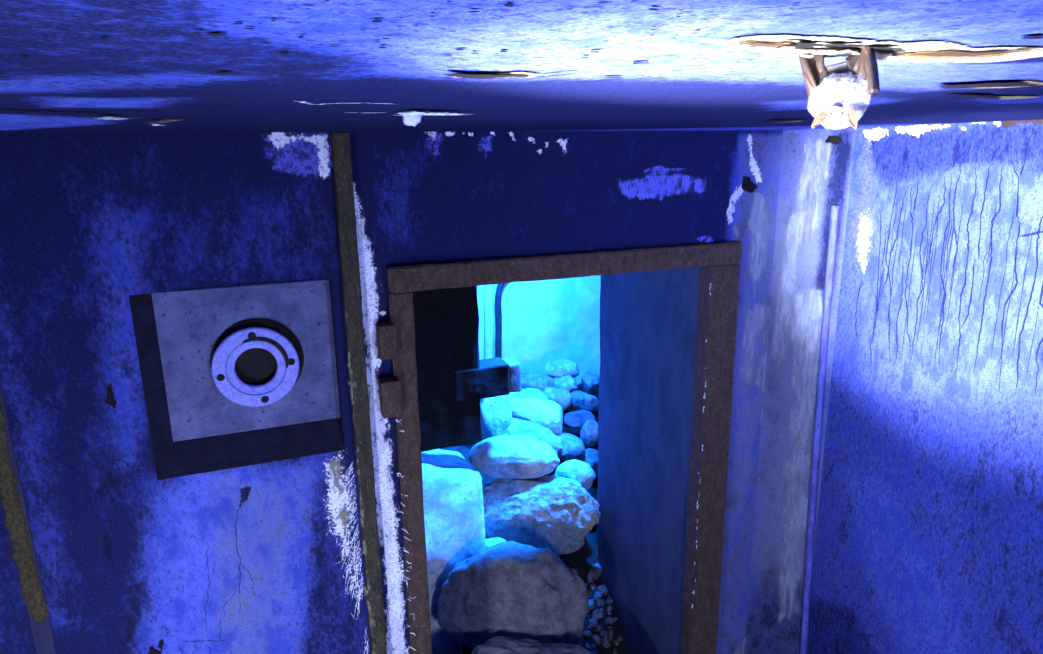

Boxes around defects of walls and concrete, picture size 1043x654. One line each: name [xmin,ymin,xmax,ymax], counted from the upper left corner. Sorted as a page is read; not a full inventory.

spalling [722,35,1043,63]
spalling [939,81,1043,100]
damp [323,183,415,654]